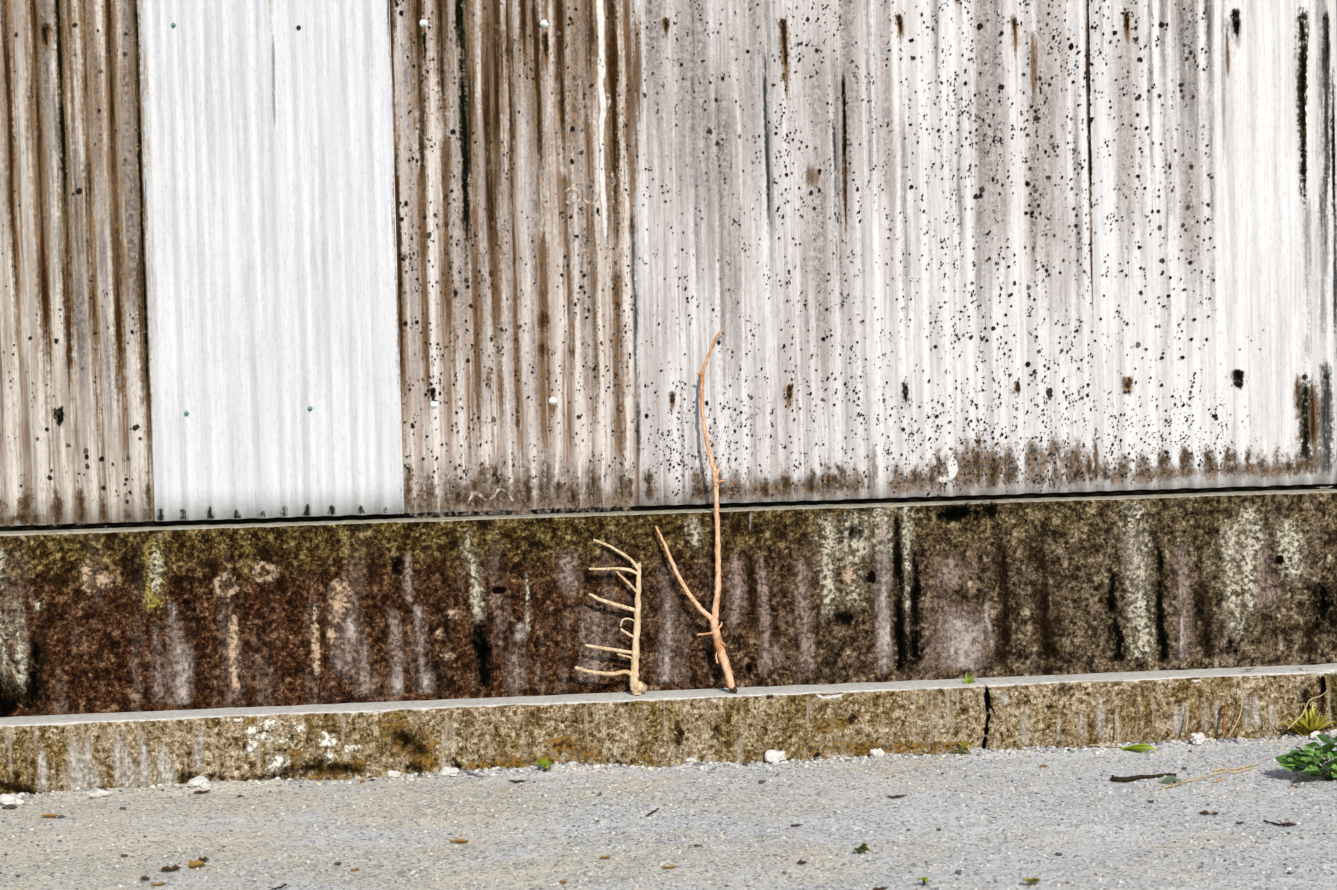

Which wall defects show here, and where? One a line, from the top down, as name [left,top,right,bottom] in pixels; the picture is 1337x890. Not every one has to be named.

corrosion [41,23,52,54]
corrosion [541,31,549,69]
leakage [1030,0,1102,308]
leakage [1295,1,1337,334]
corrosion [54,406,66,426]
leakage [691,350,1337,533]
leakage [122,542,193,705]
leakage [368,552,434,694]
leakage [728,551,781,676]
leakage [875,515,925,672]
leakage [1155,538,1238,662]
crack [982,686,995,749]